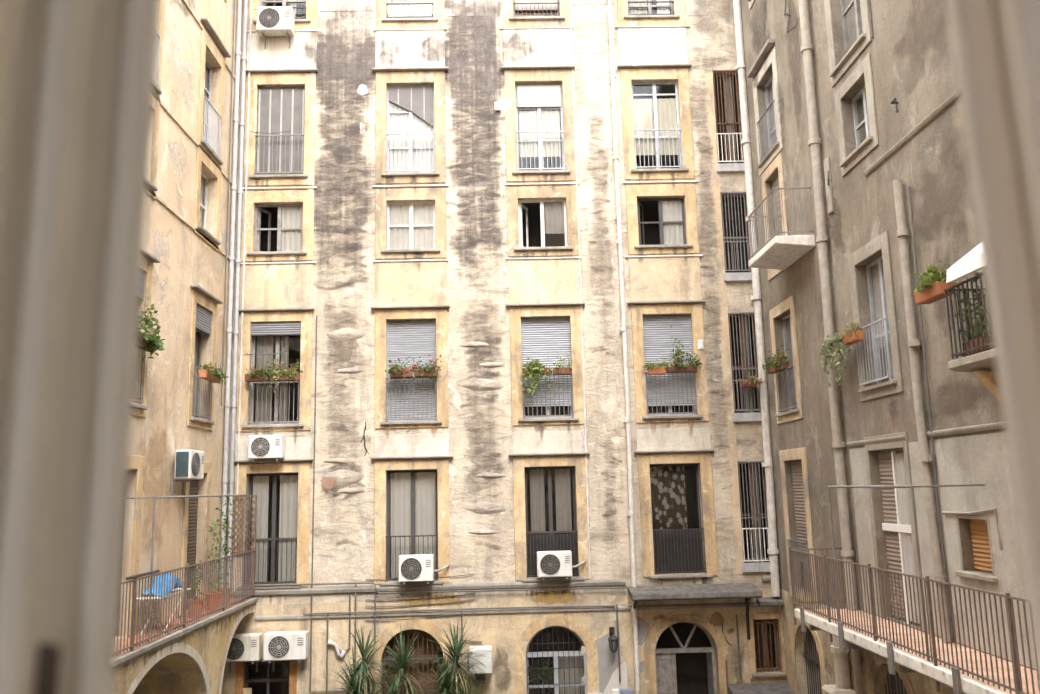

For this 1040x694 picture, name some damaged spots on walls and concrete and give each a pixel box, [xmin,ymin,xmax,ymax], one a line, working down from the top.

water stain [305,11,392,279]
water stain [422,0,532,267]
crack [360,422,369,456]